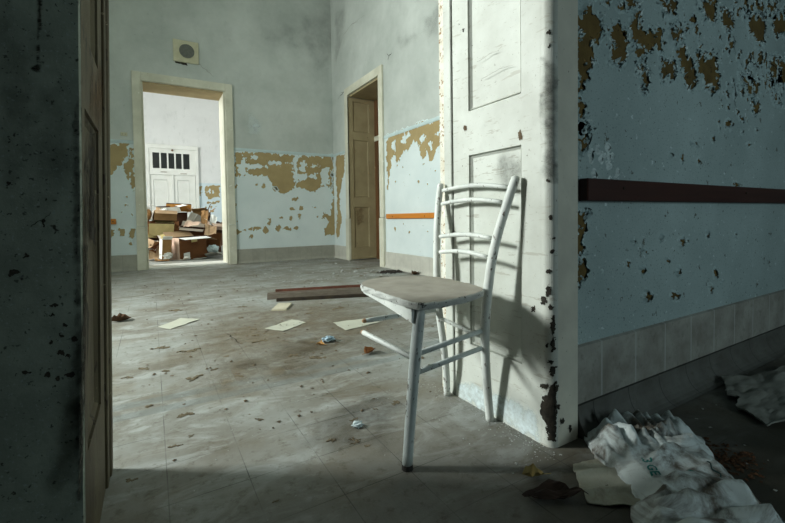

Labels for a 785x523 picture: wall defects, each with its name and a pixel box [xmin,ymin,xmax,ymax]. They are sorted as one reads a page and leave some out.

peeling [578,0,785,180]
peeling [110,142,135,192]
peeling [199,184,221,213]
peeling [234,151,345,240]
peeling [385,119,440,191]
spalling [530,286,572,442]